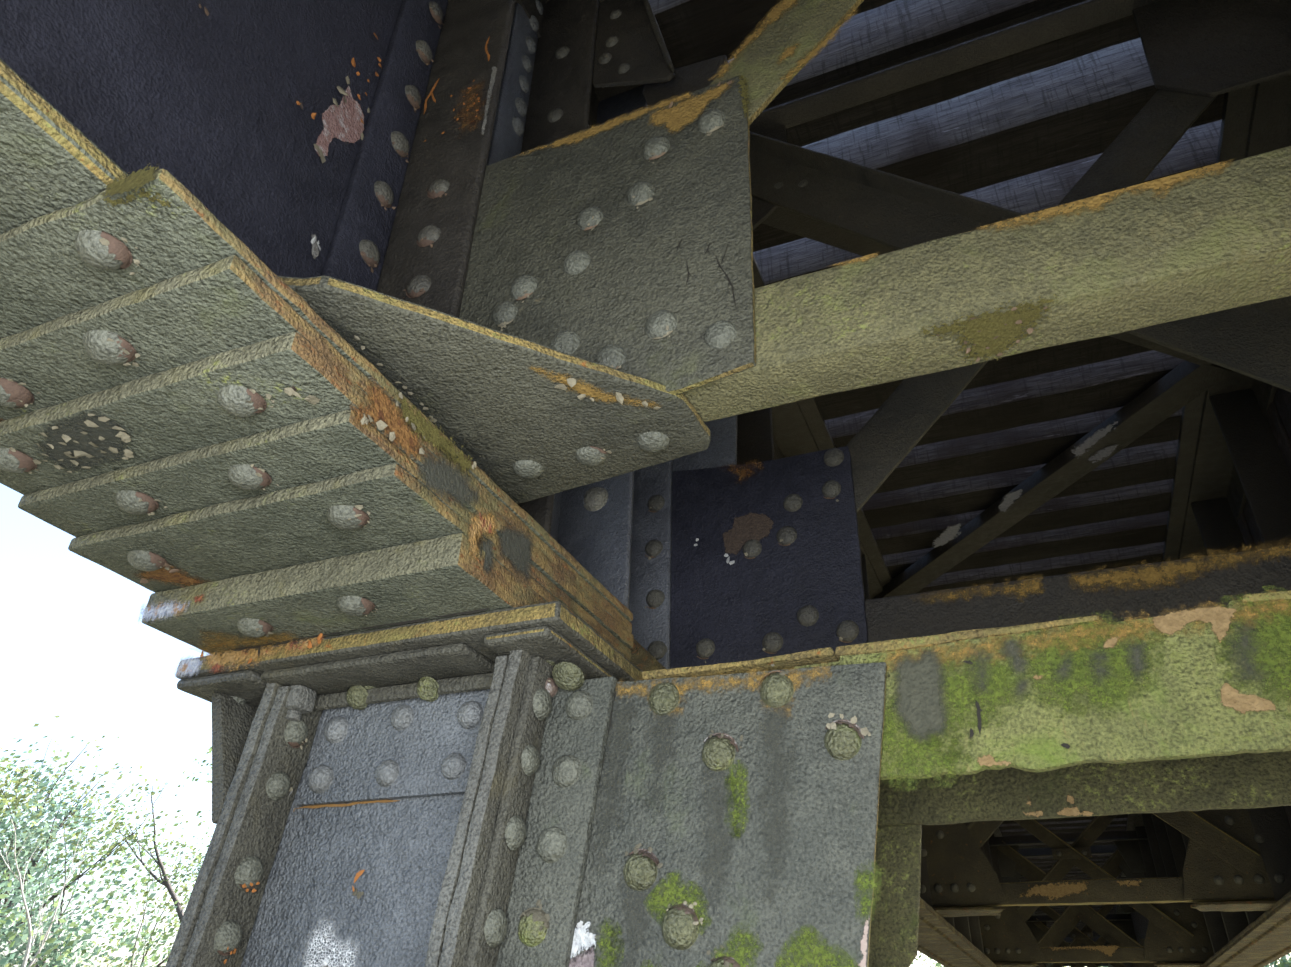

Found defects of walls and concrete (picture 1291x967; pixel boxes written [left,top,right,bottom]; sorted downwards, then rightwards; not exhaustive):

rust [520,0,797,156]
peeling [296,57,382,163]
rust [469,513,496,557]
rust [1072,545,1291,588]
rust [927,577,1043,602]
spalling [1152,606,1236,643]
rust [199,632,323,673]
spalling [1220,683,1276,714]